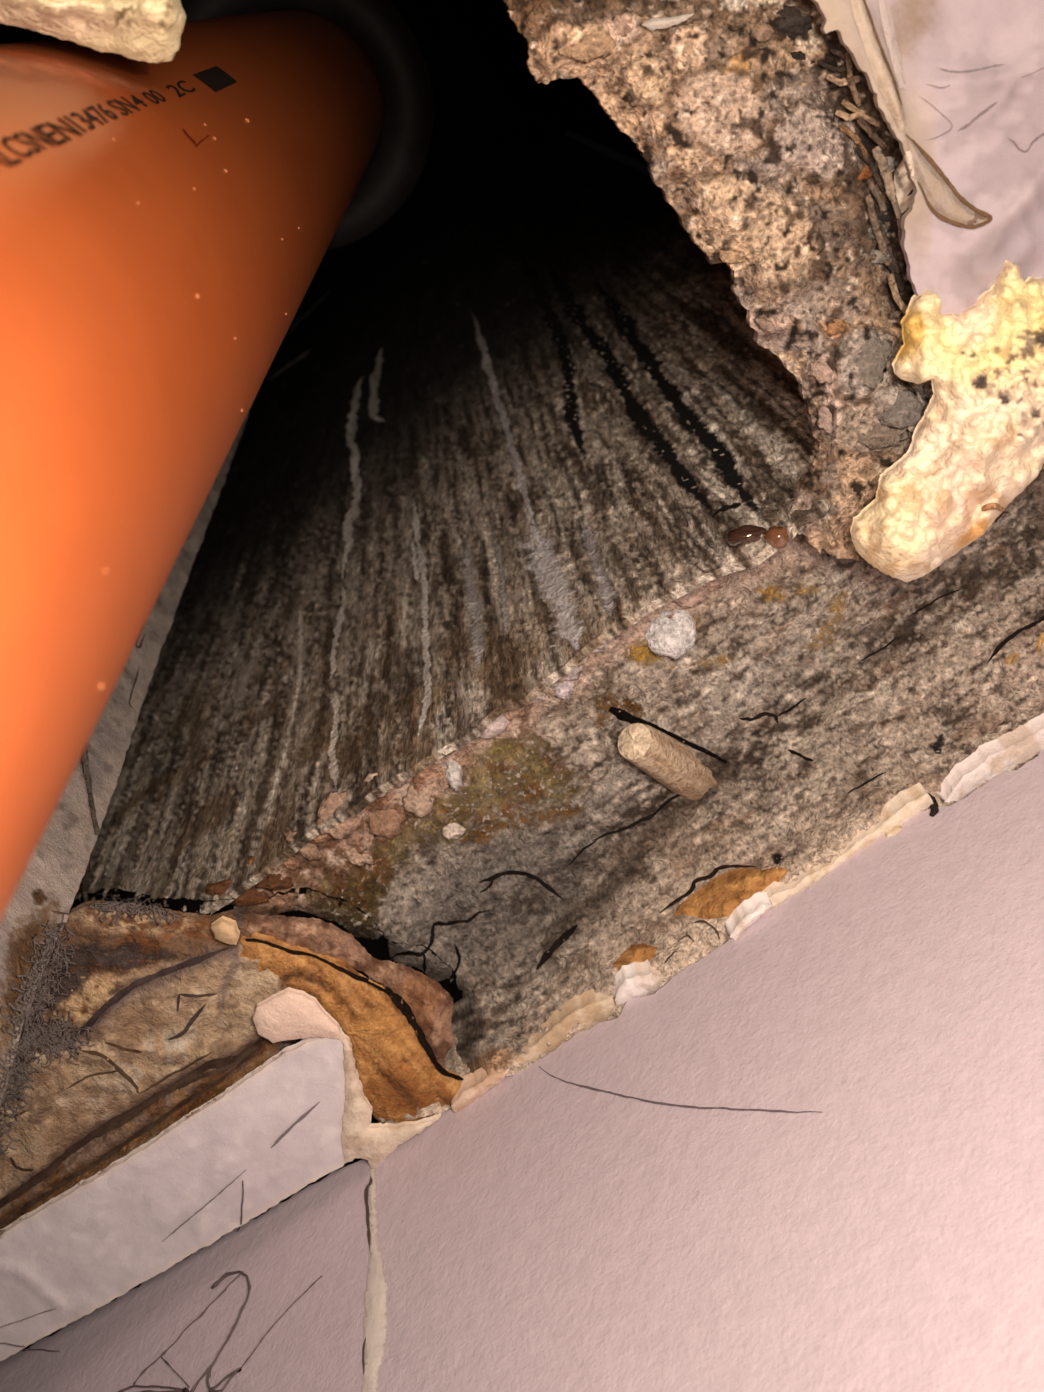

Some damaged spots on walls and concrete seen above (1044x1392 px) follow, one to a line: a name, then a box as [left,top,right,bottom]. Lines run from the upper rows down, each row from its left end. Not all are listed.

peeling [850,0,993,229]
spalling [502,0,933,561]
efflorescence [289,611,304,726]
efflorescence [327,348,385,788]
efflorescence [411,499,432,736]
damp [461,548,486,674]
damp [473,316,586,650]
spalling [0,469,1044,1229]
crack [0,794,681,1227]
crack [539,1067,818,1113]
crack [364,1168,373,1255]
crack [360,1337,368,1374]